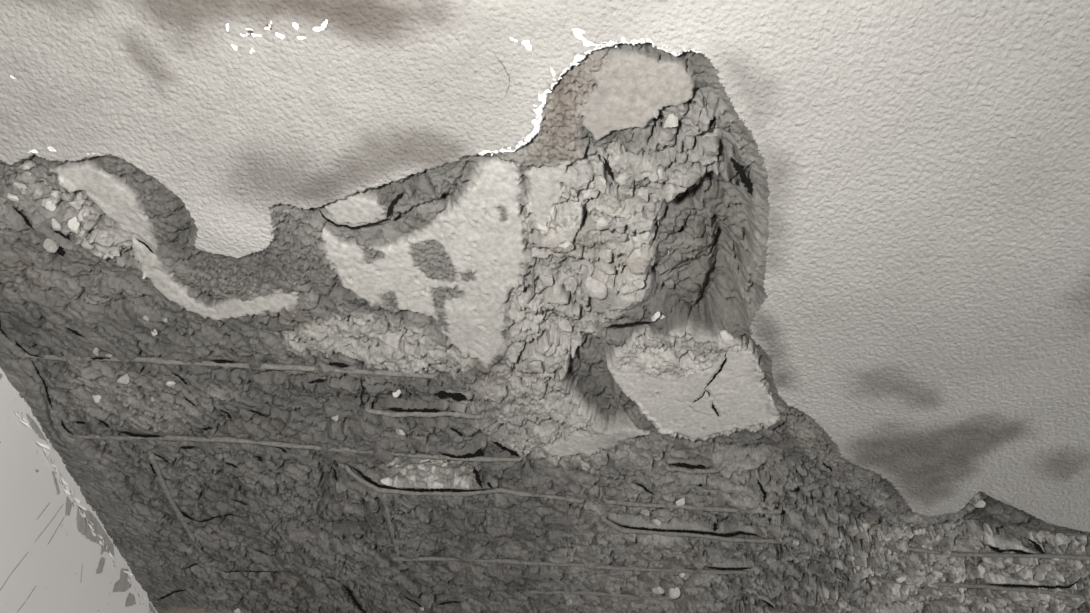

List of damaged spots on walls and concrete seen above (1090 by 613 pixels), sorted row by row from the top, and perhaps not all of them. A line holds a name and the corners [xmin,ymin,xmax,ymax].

damp [148,0,376,23]
spalling [595,176,606,194]
spalling [615,172,632,189]
spalling [584,276,607,300]
spalling [261,363,318,372]
spalling [365,398,486,419]
spalling [69,433,373,454]
spalling [391,452,524,462]
spalling [344,465,586,503]
spalling [600,514,780,563]
spalling [950,552,1090,560]
spalling [929,582,1086,598]